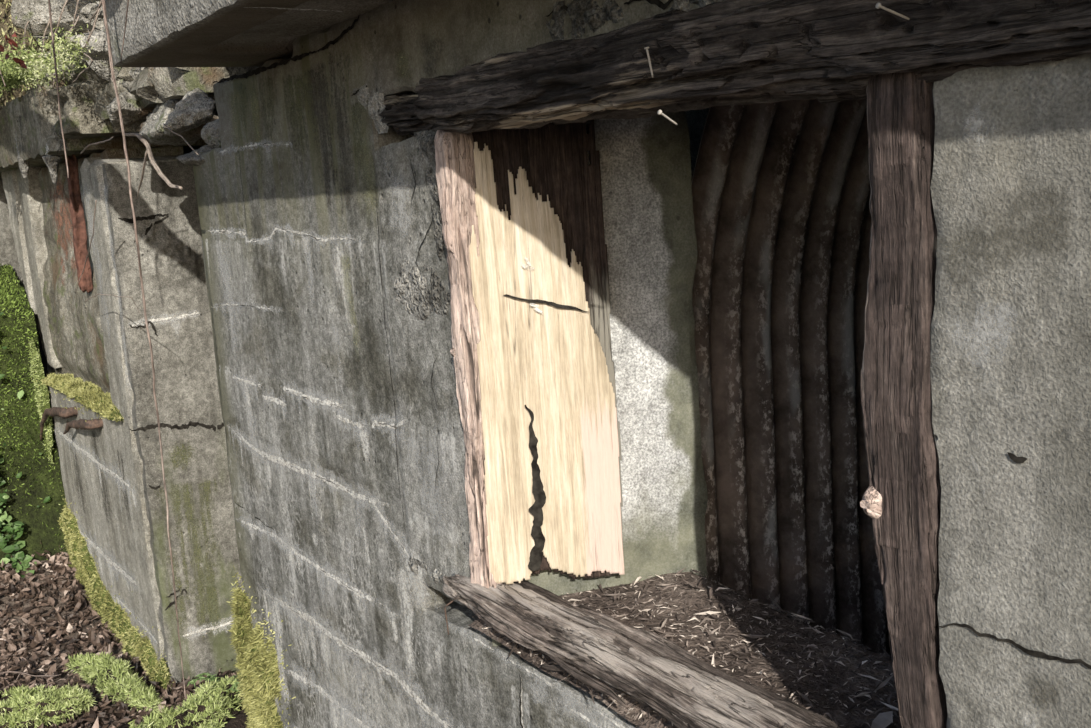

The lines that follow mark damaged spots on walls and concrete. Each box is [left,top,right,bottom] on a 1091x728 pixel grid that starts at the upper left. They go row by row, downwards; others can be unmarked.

spalling [546,0,624,41]
crack [624,0,673,10]
spalling [353,83,389,134]
crack [118,213,169,235]
crack [130,421,224,431]
crack [939,623,1091,669]
crack [517,673,525,728]